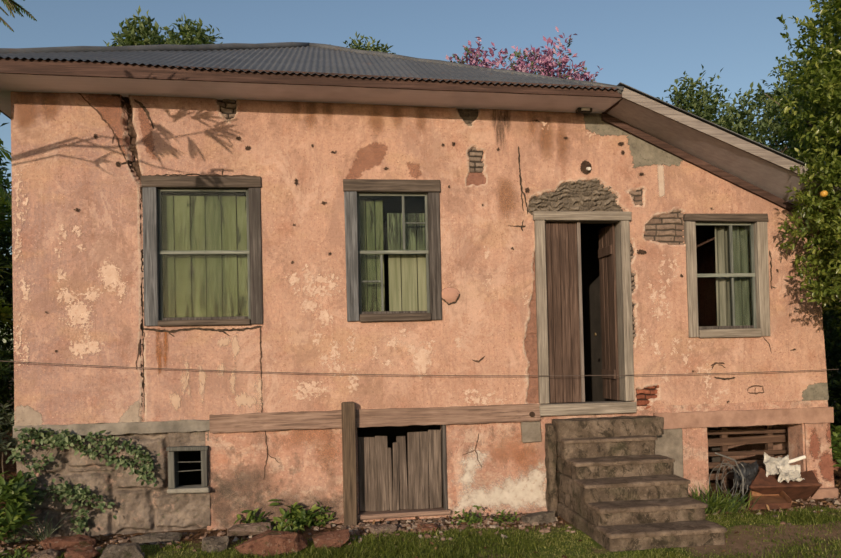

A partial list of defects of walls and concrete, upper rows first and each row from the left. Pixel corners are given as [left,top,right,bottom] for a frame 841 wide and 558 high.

spalling [217,99,237,121]
spalling [466,147,486,186]
crack [509,146,528,231]
spalling [525,179,623,215]
peeling [54,223,128,359]
crack [78,93,279,478]
peeling [283,261,359,401]
peeling [371,327,436,385]
spalling [644,210,685,321]
peeling [631,273,730,410]
leakage [456,451,546,511]